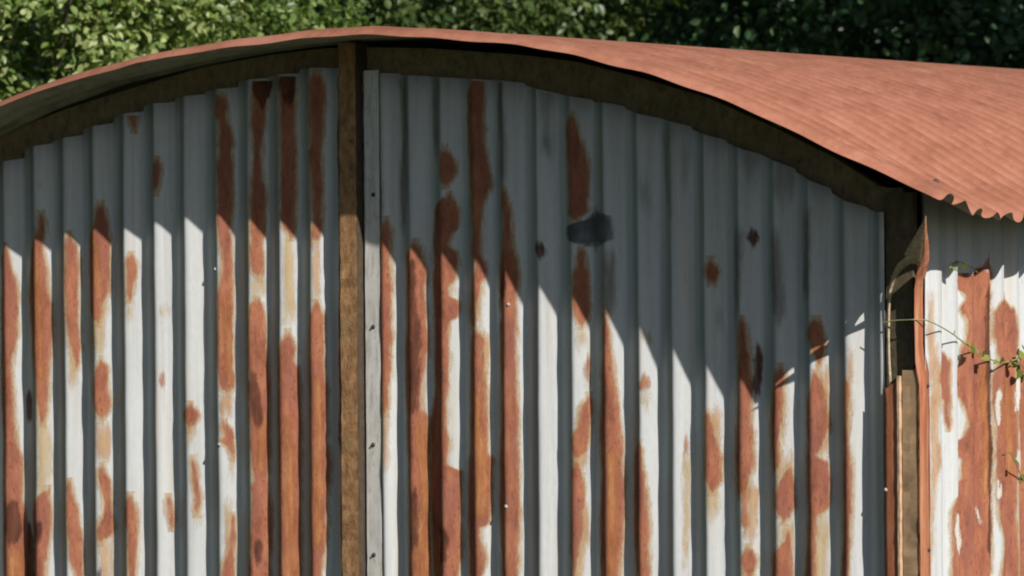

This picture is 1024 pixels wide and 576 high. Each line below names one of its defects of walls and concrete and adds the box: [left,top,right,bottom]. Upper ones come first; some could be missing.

corrosion [0,199,140,576]
corrosion [214,70,333,576]
corrosion [380,81,523,576]
corrosion [565,112,591,225]
corrosion [569,246,653,576]
corrosion [703,315,855,576]
corrosion [939,258,1024,576]